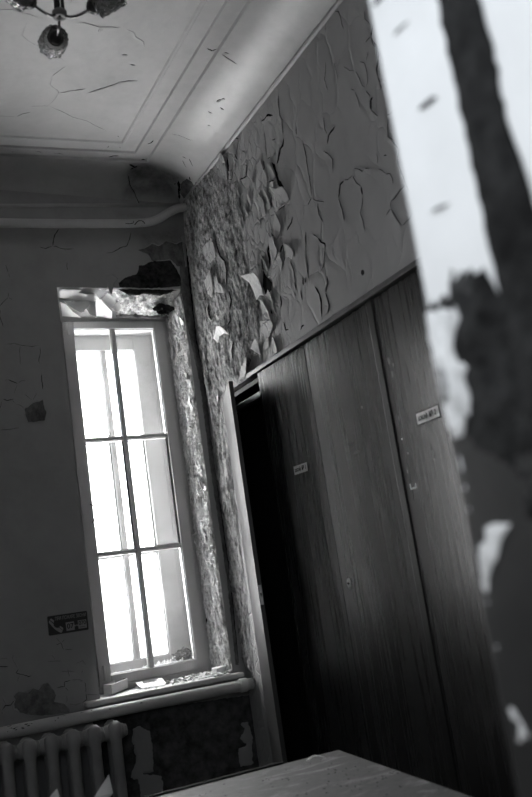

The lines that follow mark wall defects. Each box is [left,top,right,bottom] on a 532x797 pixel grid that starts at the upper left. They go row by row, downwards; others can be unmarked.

crack [206,48,237,65]
flaking render [418,96,438,118]
crack [225,11,410,333]
flaking render [426,0,532,519]
peeling [25,400,50,426]
flaking render [59,152,294,675]
flaking render [478,523,510,605]
peeling [13,682,92,730]
flaking render [93,695,259,797]
spalling [509,707,530,743]